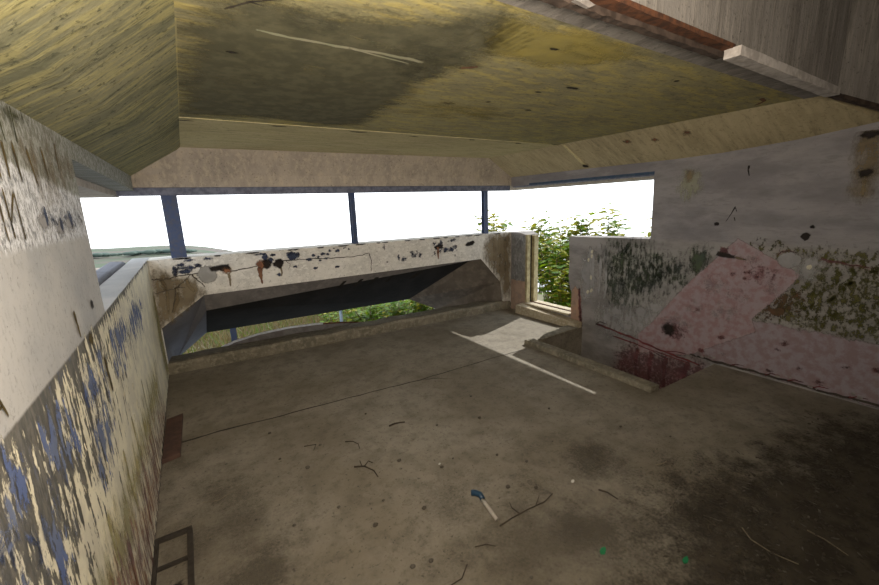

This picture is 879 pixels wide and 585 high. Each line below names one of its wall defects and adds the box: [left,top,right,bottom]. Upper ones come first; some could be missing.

water stain [177,0,632,125]
peeling [0,262,169,585]
water stain [615,342,704,389]